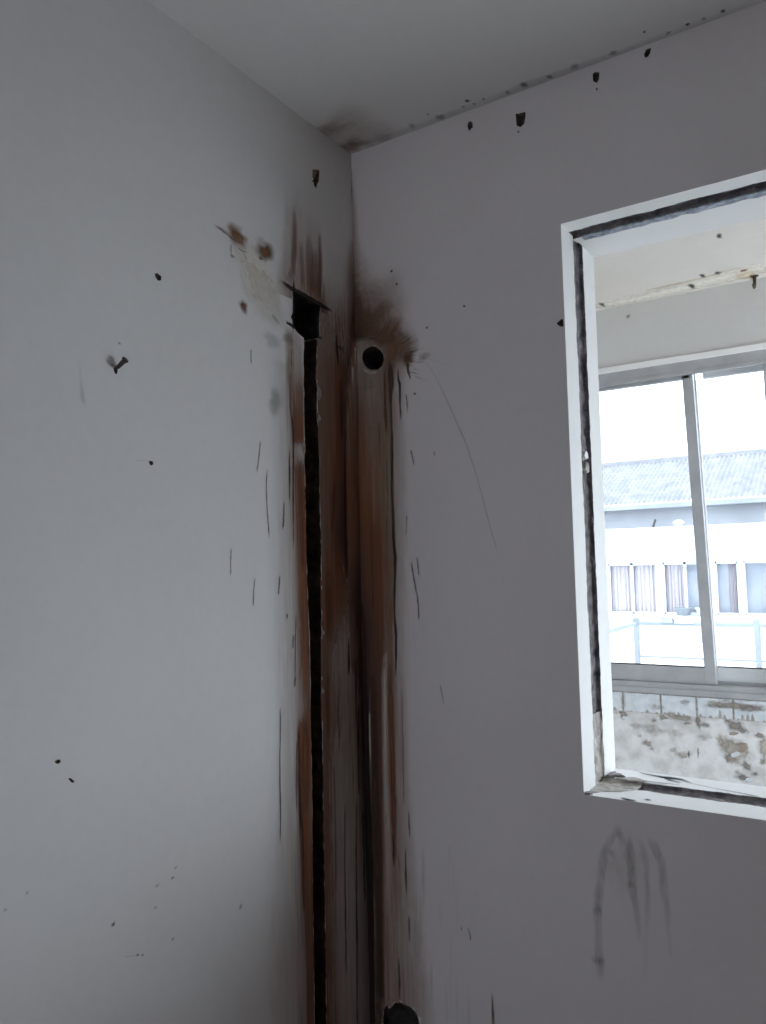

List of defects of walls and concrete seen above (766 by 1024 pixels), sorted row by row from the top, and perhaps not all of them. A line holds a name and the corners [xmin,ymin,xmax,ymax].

rust [222,228,245,257]
rust [258,245,272,259]
rust [289,252,411,1024]